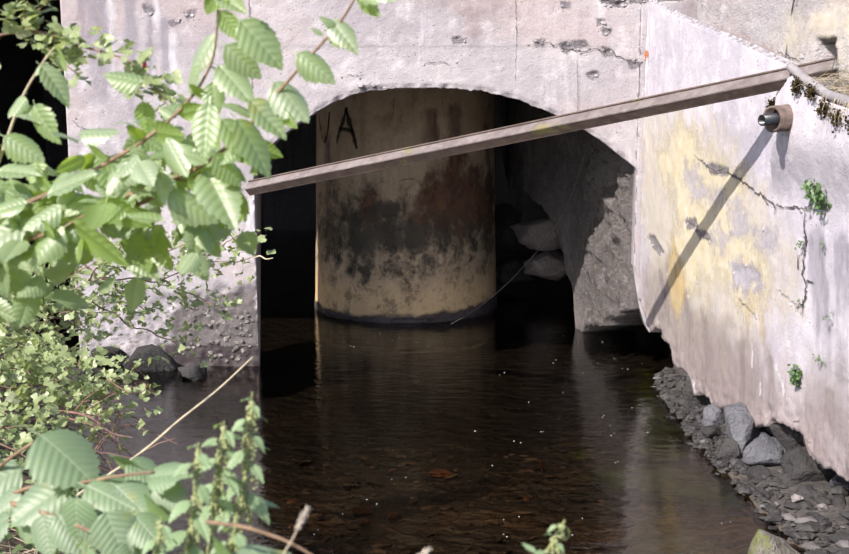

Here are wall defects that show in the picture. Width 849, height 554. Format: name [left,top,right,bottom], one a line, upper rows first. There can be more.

spalling [168,9,195,26]
spalling [560,39,588,54]
water stain [317,169,495,289]
peeling [642,111,776,346]
crack [694,155,815,314]